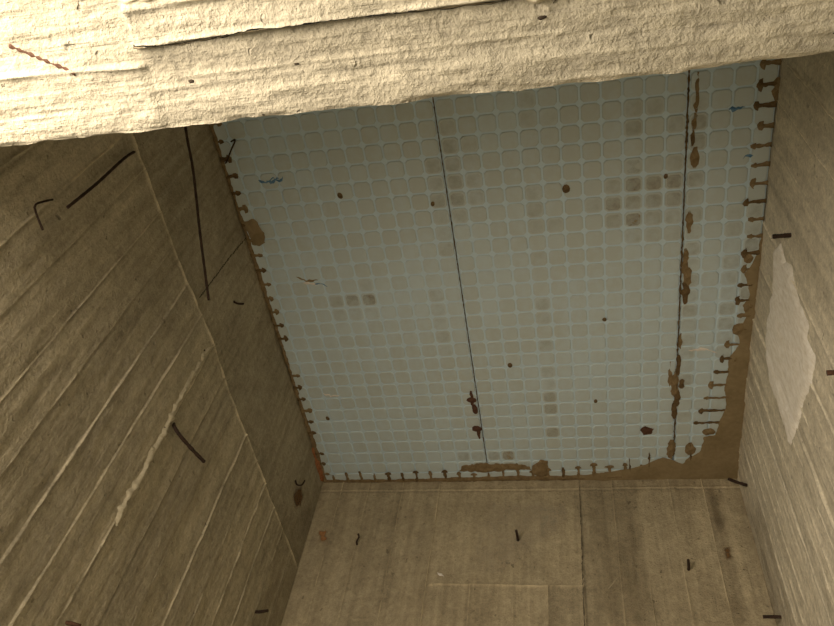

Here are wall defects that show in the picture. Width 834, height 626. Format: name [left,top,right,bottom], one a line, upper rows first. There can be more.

corrosion [432,97,487,462]